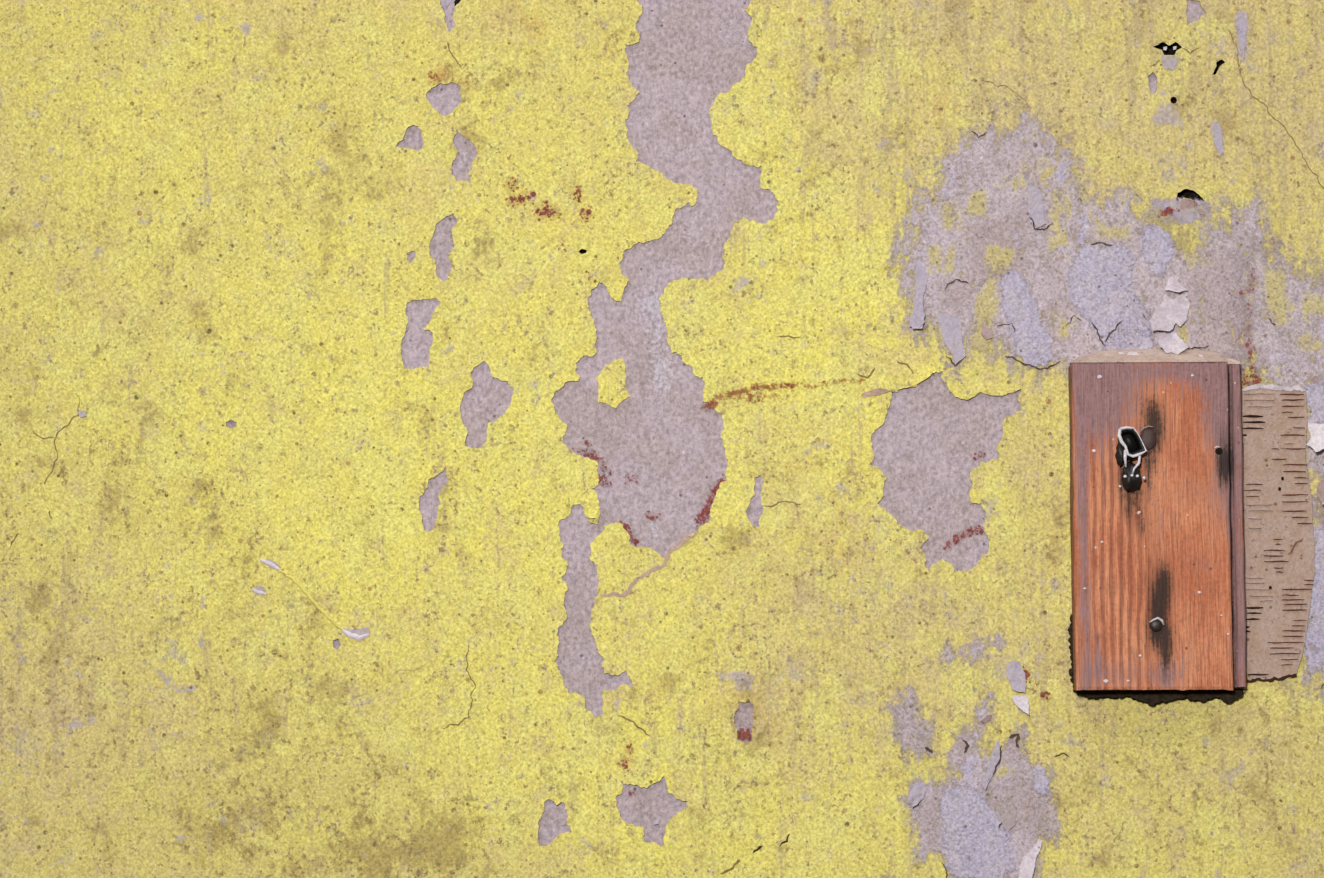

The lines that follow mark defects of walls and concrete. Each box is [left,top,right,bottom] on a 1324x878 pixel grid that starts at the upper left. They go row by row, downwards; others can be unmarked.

peeling [426,83,462,116]
crack [1228,30,1324,189]
peeling [407,214,457,282]
peeling [401,298,441,370]
peeling [460,361,513,448]
peeling [551,0,778,717]
corrosion [701,377,865,411]
peeling [861,105,1324,709]
peeling [419,467,449,531]
peeling [882,632,1069,878]
peeling [538,797,571,846]
peeling [616,776,687,846]